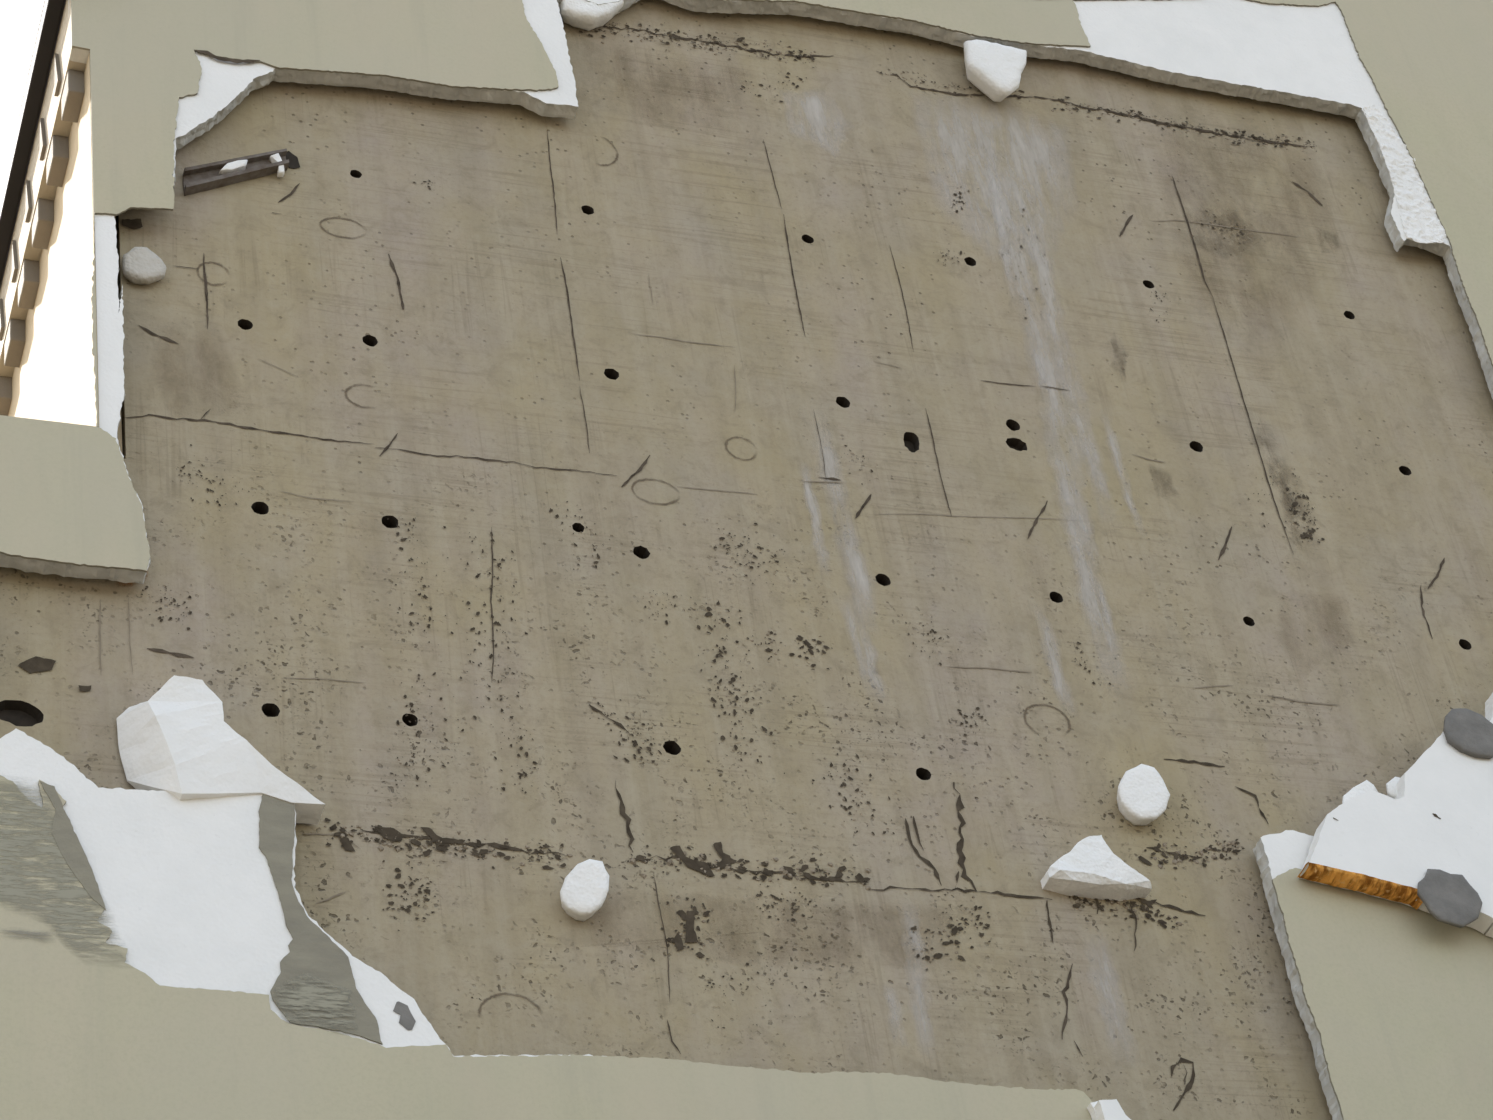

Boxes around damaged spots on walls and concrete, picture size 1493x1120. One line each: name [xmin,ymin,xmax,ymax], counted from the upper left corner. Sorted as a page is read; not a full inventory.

spalling [1363,105,1447,244]
spalling [19,656,56,673]
spalling [389,518,539,793]
spalling [640,590,833,768]
peeling [0,781,117,955]
spalling [324,816,573,931]
spalling [661,897,713,959]
spalling [627,842,871,921]
spalling [910,892,991,973]
spalling [1069,895,1182,933]
spalling [1138,839,1245,869]
spalling [393,1001,416,1030]